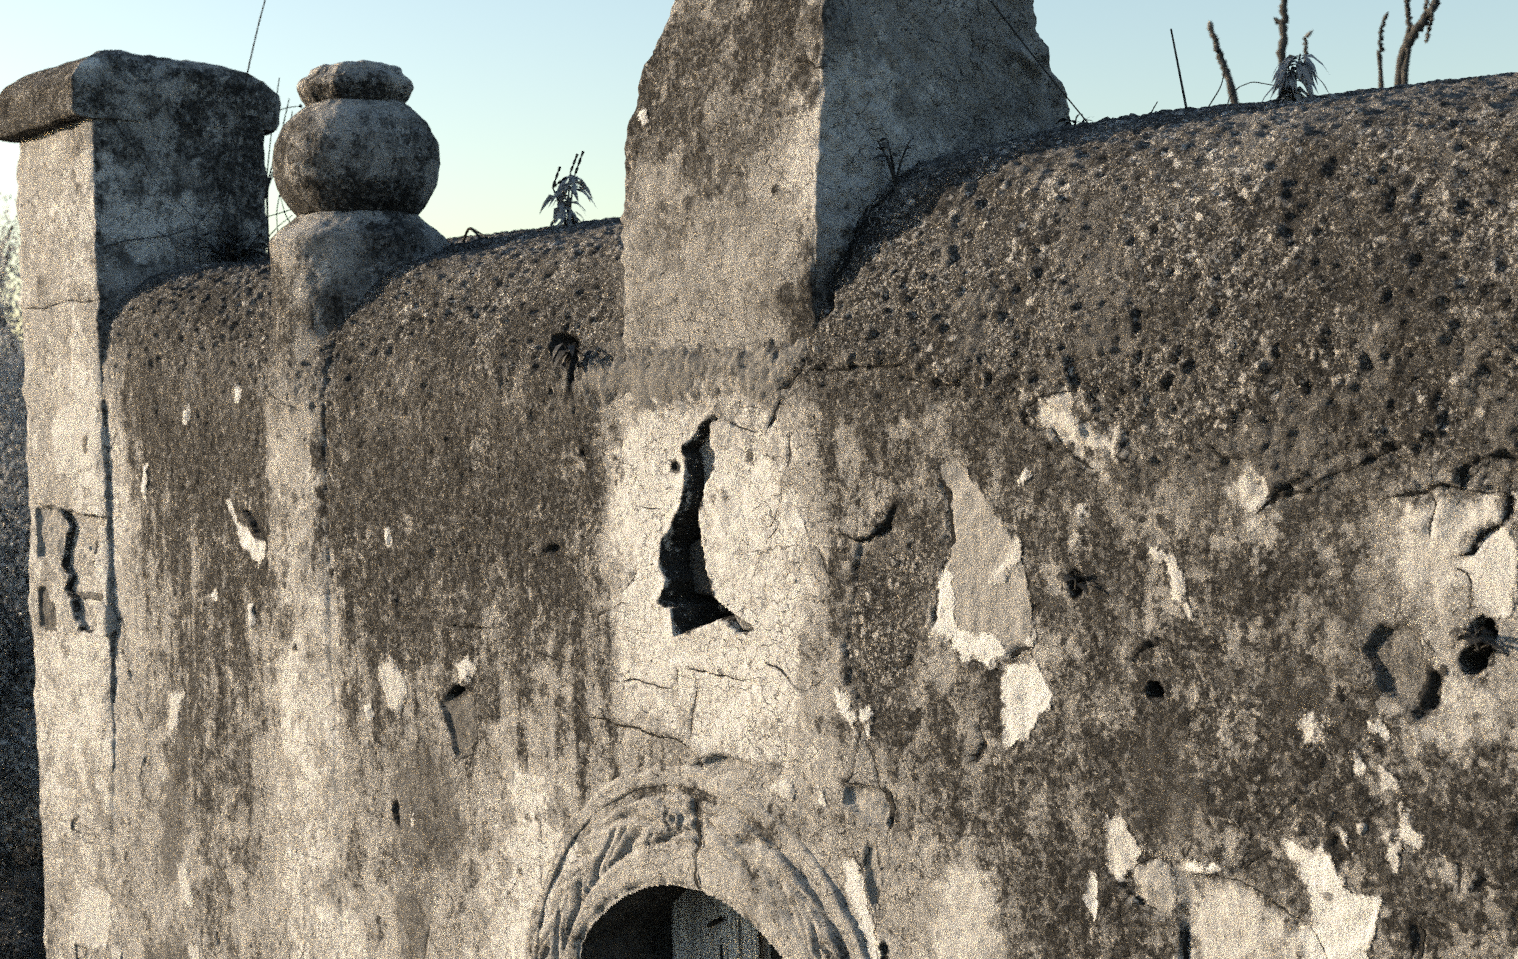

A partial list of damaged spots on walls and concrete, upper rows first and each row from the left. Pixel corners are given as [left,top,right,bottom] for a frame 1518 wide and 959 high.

spalling [35,504,118,638]
flaking render [690,538,752,630]
flaking render [710,421,752,464]
flaking render [929,460,1053,747]
crack [1204,443,1244,459]
crack [1252,437,1416,516]
crack [1388,454,1518,597]
crack [589,662,827,890]
flaking render [1172,751,1424,959]